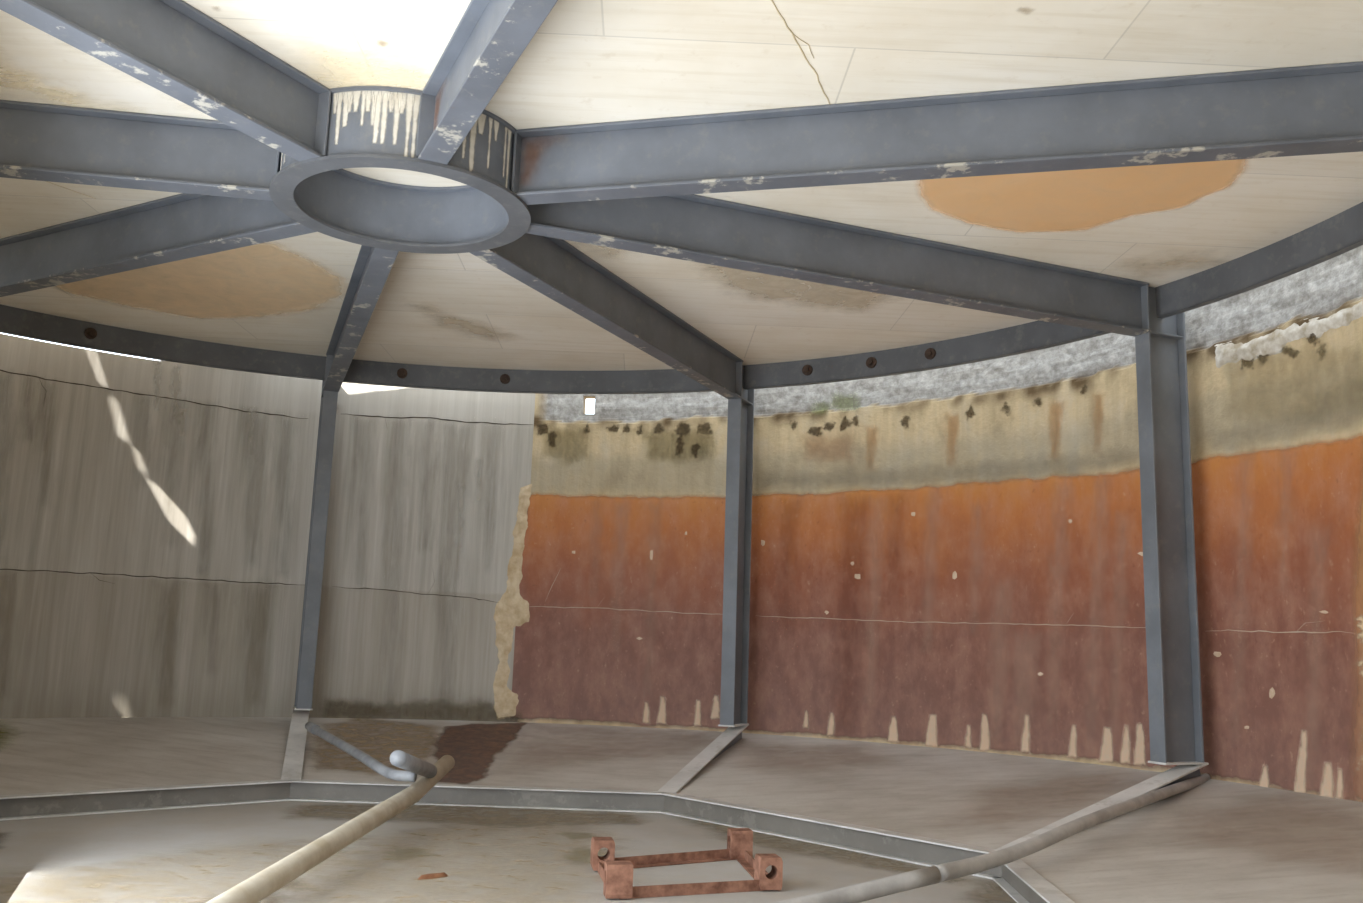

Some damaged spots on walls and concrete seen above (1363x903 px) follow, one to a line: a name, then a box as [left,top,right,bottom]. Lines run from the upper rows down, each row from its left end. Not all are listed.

crack [771,0,830,105]
leakage [333,78,421,158]
peeling [922,159,1243,232]
peeling [61,244,339,317]
leakage [537,424,557,446]
leakage [606,423,711,458]
leakage [792,416,858,436]
crack [0,569,295,585]
spalling [493,484,532,720]
corrosion [433,494,728,784]
corrosion [744,469,1177,768]
corrosion [1191,436,1363,801]